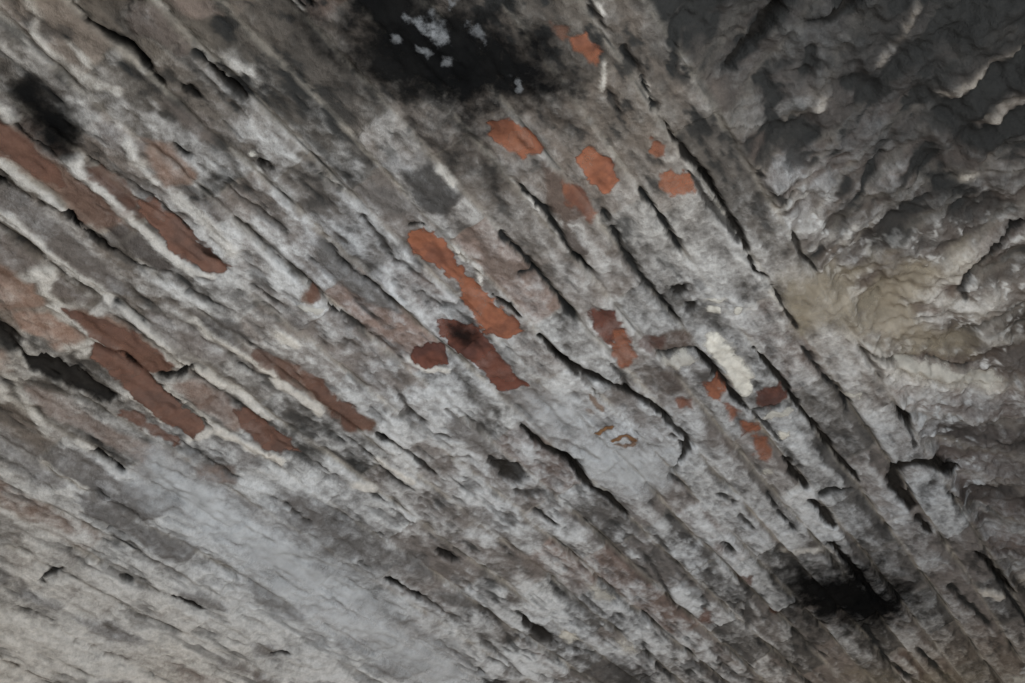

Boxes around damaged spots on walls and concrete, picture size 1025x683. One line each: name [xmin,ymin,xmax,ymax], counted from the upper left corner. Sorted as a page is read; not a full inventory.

spalling [0,124,67,188]
spalling [486,118,543,159]
spalling [563,146,619,222]
spalling [659,170,695,197]
spalling [137,197,232,273]
spalling [61,308,205,447]
spalling [233,407,301,453]
spalling [303,377,373,432]
spalling [407,228,530,391]
crack [492,293,691,458]
spalling [588,308,637,368]
peeling [703,332,793,460]